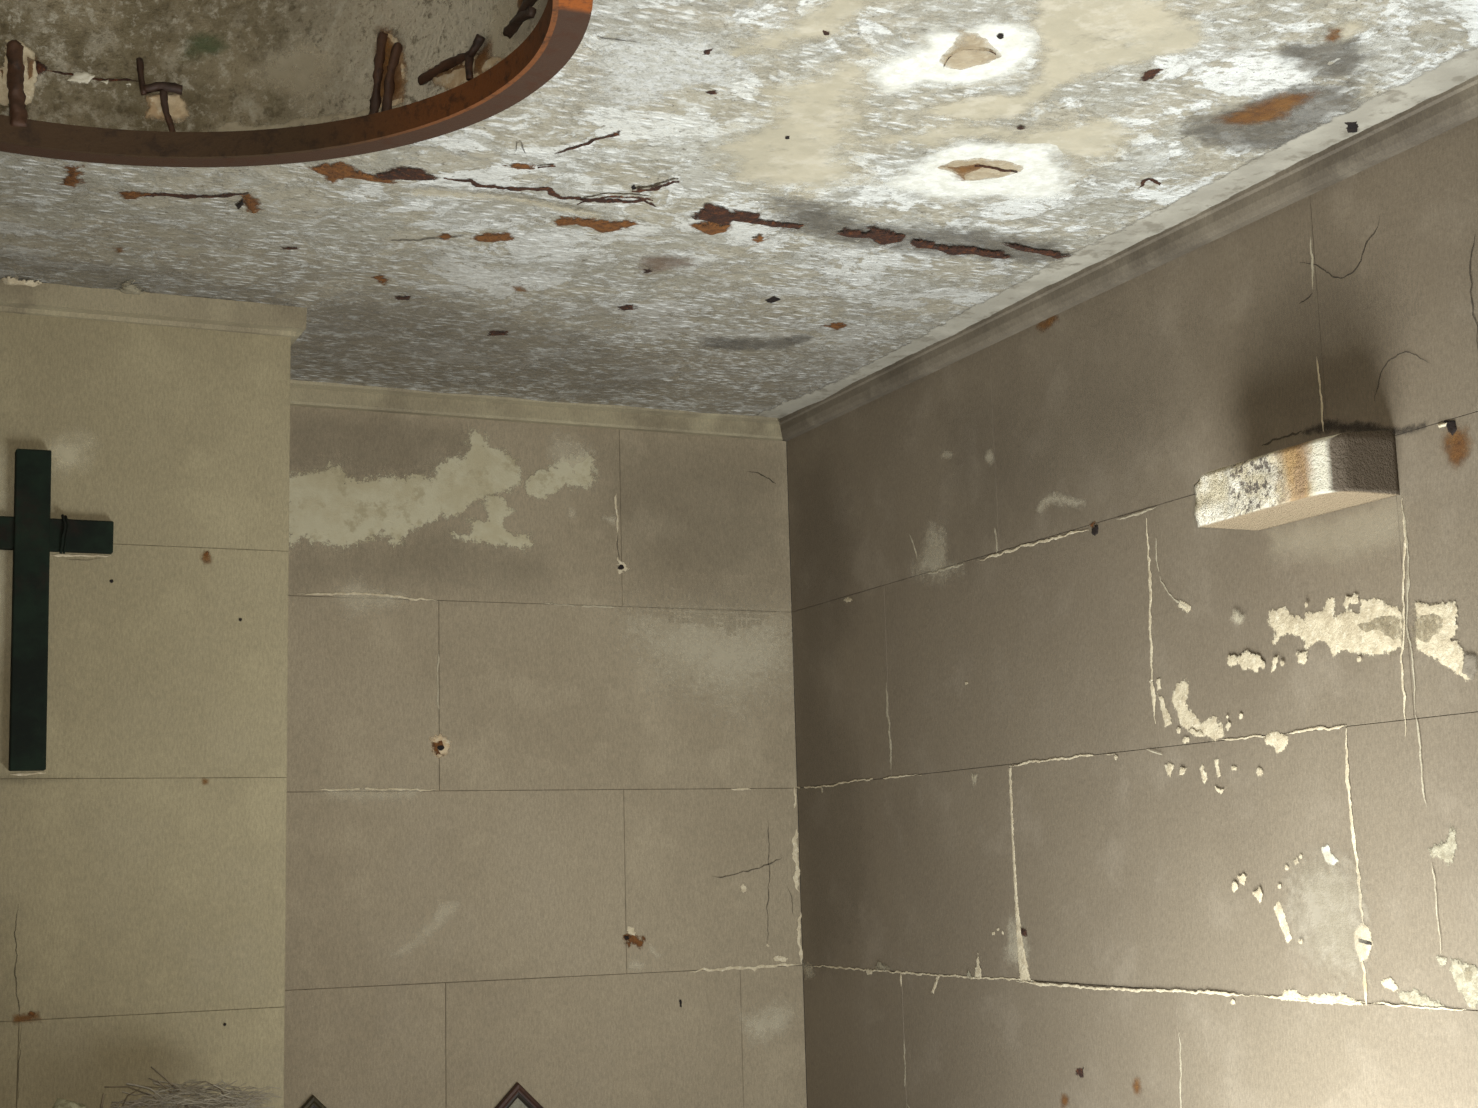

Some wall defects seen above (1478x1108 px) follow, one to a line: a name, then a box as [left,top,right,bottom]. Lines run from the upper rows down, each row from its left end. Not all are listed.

spalling [368,0,538,122]
water stain [867,23,1039,94]
water stain [1284,39,1361,77]
rust [505,143,556,170]
water stain [887,126,1074,201]
rust [554,216,637,233]
crack [1300,218,1380,303]
crack [1469,236,1478,348]
crack [1374,351,1431,398]
rust [1446,432,1467,464]
flaking render [289,429,598,550]
flaking render [1227,593,1477,682]